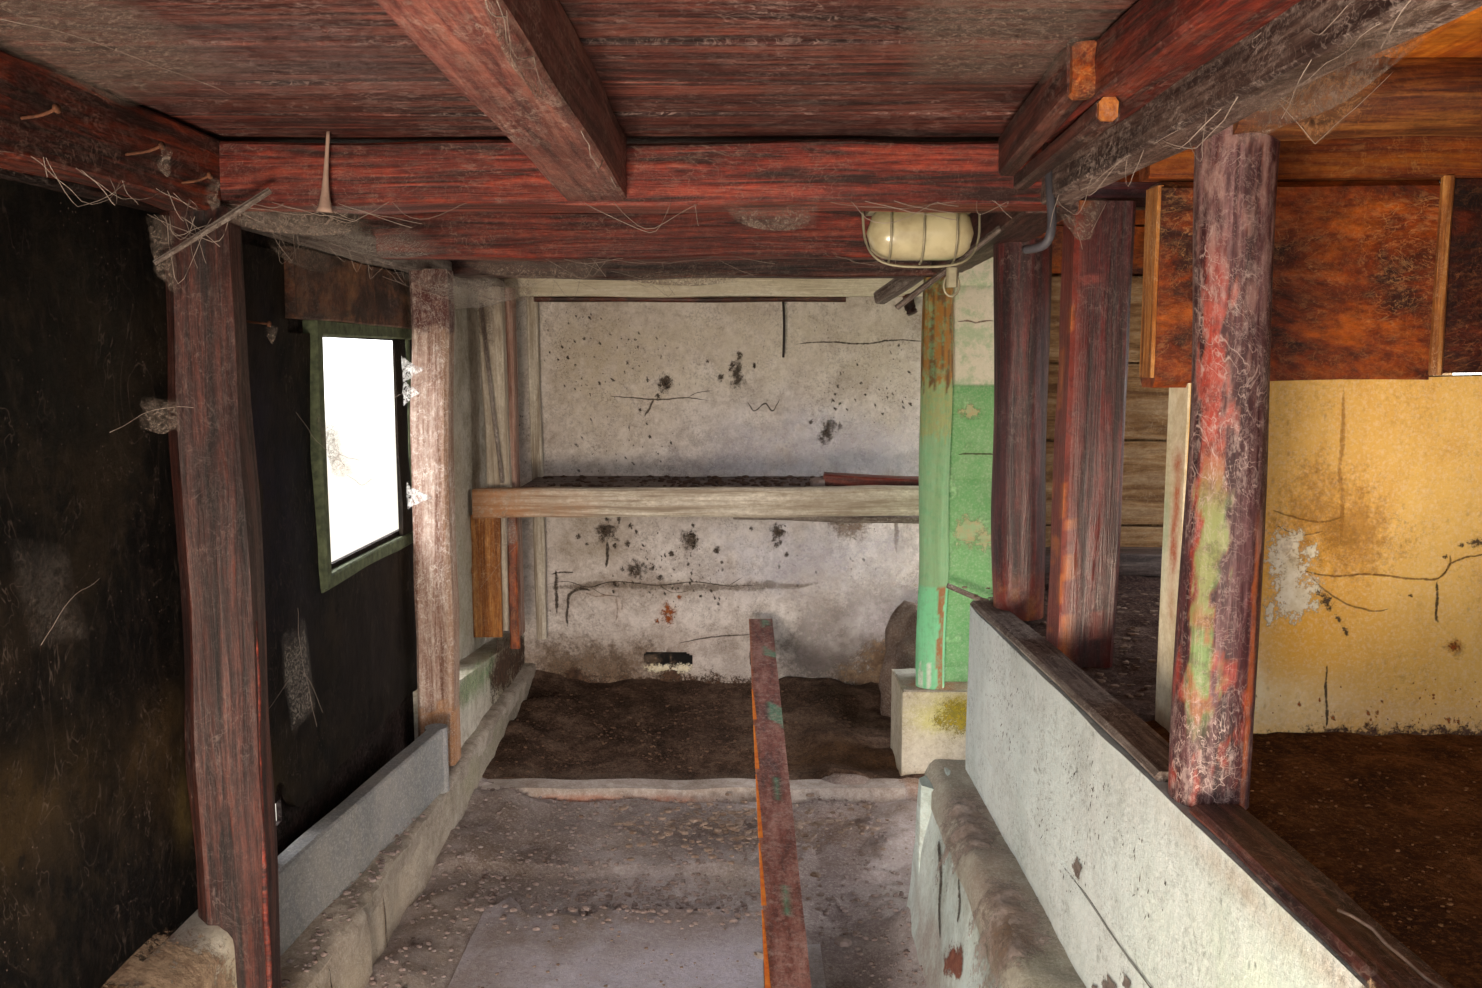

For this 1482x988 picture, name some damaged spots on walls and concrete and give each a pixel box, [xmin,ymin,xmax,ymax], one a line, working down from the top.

leakage [576,517,720,593]
leakage [771,522,789,557]
peeling [1263,525,1324,627]
crack [1278,512,1482,612]
flaking render [104,929,237,988]
spalling [1091,972,1131,988]